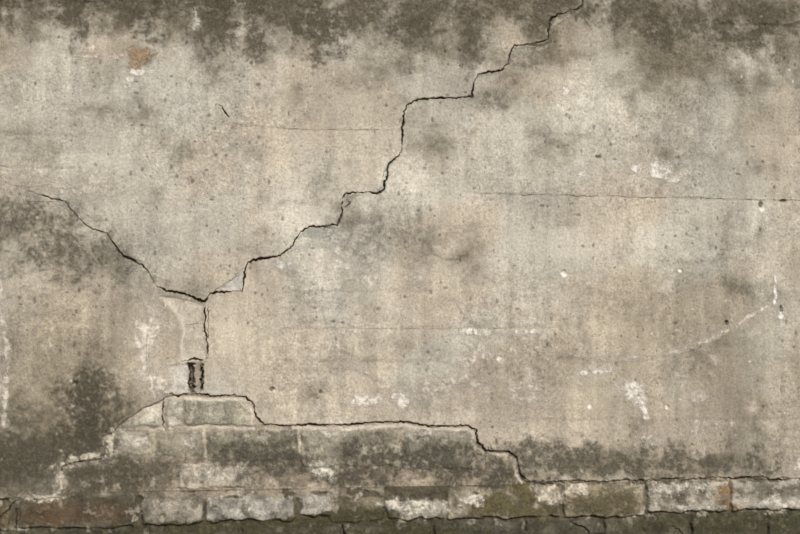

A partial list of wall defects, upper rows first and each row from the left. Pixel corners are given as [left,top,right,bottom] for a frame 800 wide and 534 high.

water stain [24,0,572,67]
water stain [608,0,795,51]
water stain [0,162,118,283]
crack [0,0,599,496]
water stain [0,255,149,503]
water stain [133,305,169,399]
spalling [61,294,527,496]
water stain [377,497,450,516]
water stain [188,430,737,507]
crack [619,475,684,485]
crack [706,473,789,484]
water stain [747,494,800,510]